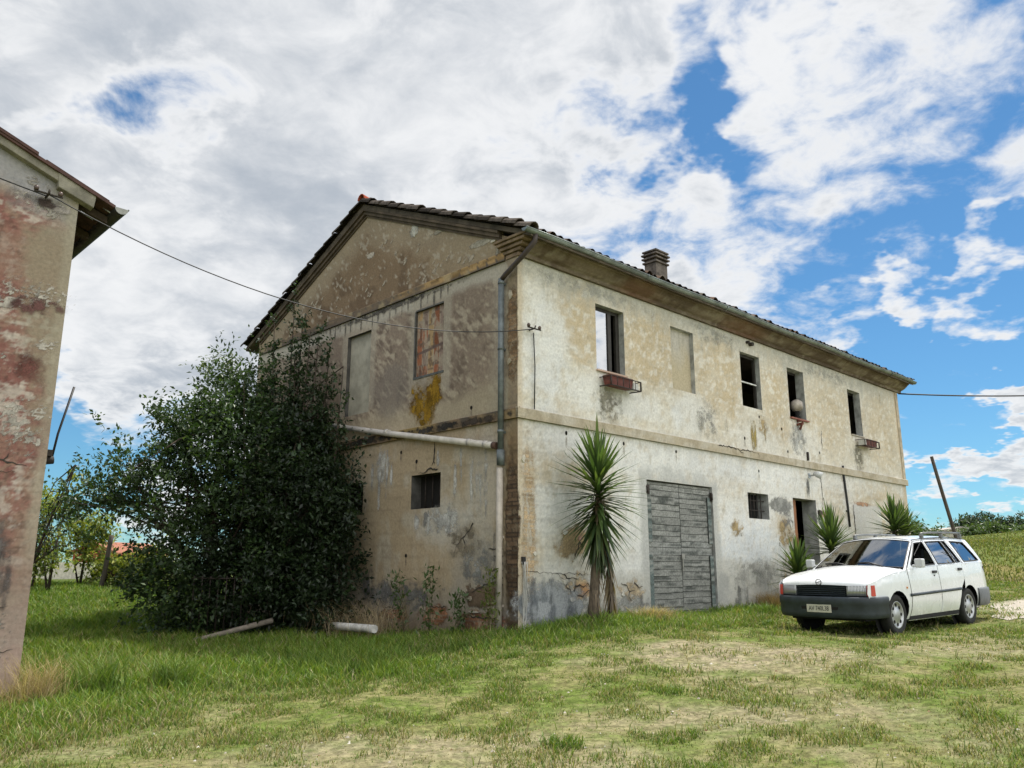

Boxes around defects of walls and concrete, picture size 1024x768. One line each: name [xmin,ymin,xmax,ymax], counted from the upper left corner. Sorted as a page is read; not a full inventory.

flaking render [360,225,498,282]
peeling [0,282,67,314]
peeling [17,340,58,378]
peeling [0,399,52,456]
crack [452,523,479,556]
flaking render [619,580,644,601]